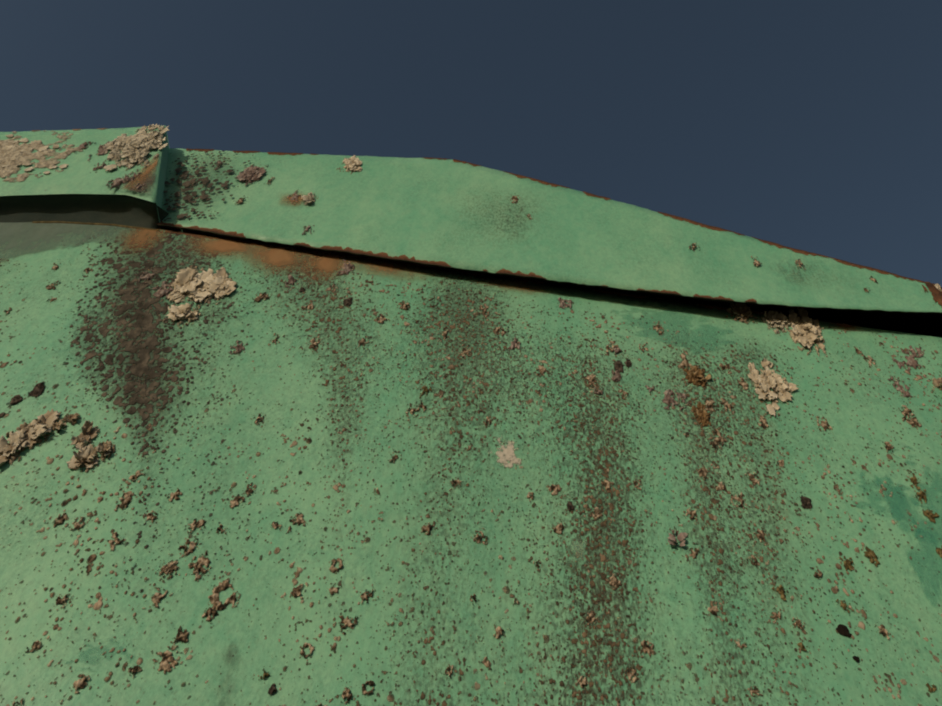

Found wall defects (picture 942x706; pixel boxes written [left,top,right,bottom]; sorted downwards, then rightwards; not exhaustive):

rust [504,171,569,188]
rust [128,221,546,288]
rust [657,211,942,306]
leakage [0,149,942,706]